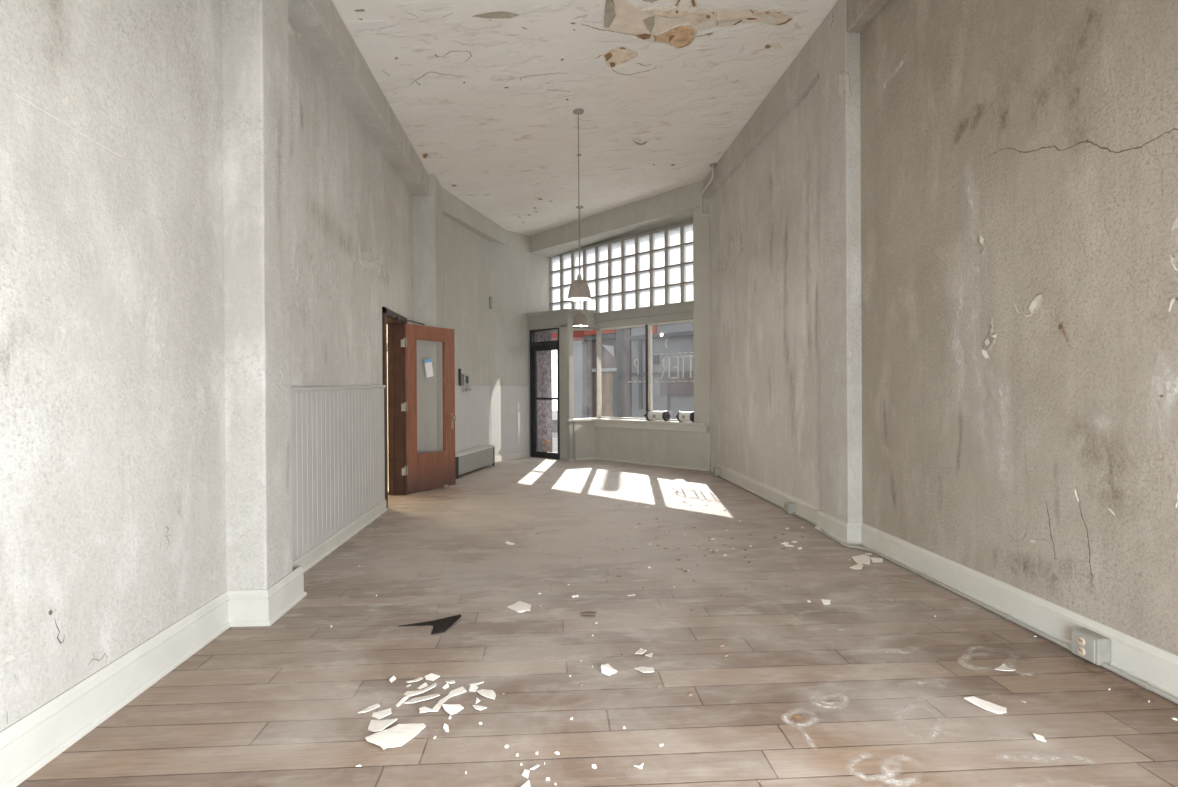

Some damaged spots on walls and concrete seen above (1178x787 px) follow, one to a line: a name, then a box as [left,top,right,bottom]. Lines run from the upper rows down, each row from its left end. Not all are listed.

peeling [569,0,794,75]
crack [984,128,1178,239]
peeling [981,315,997,358]
peeling [1013,293,1045,317]
crack [1032,487,1116,592]